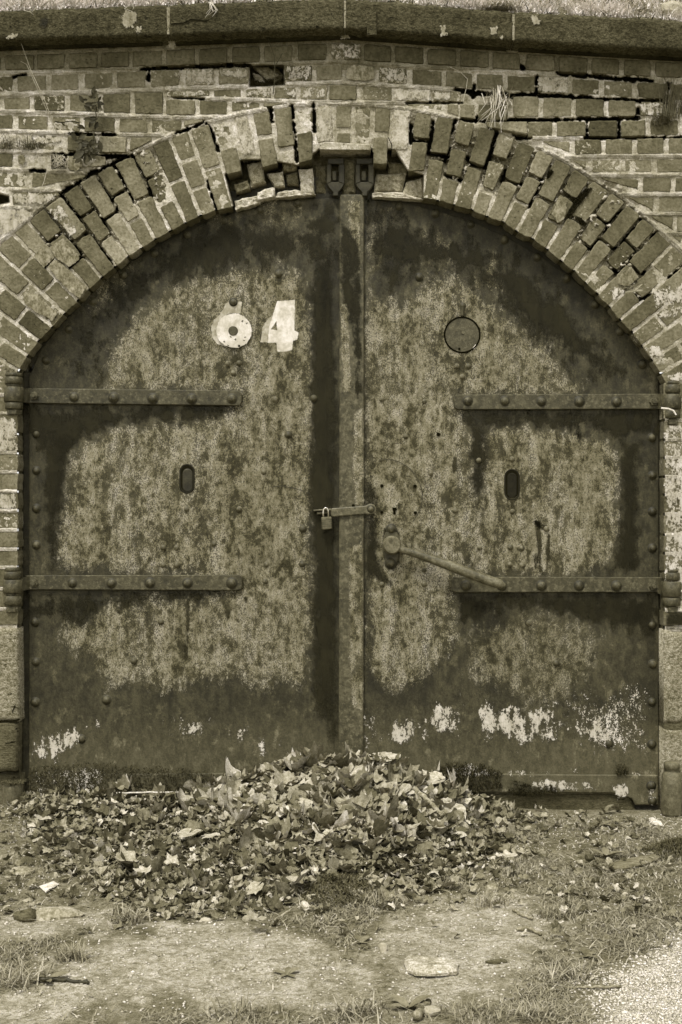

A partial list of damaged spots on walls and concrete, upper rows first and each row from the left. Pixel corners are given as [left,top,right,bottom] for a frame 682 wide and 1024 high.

spalling [252,66,284,85]
rust [533,520,551,573]
peeling [32,721,99,763]
peeling [381,701,460,744]
peeling [478,683,647,754]